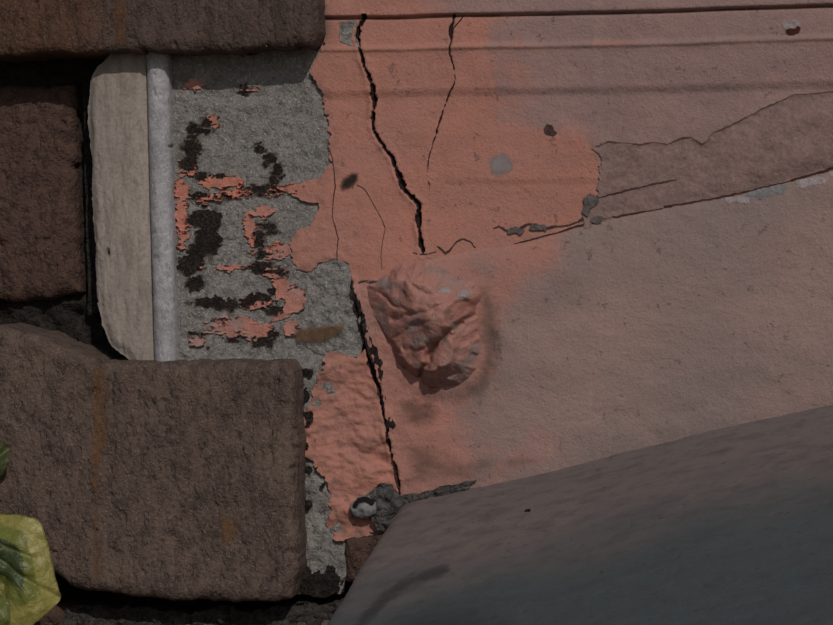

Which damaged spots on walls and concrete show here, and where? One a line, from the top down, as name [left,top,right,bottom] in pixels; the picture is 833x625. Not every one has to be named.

spalling [236,83,260,96]
spalling [174,115,364,357]
crack [327,145,339,261]
crack [356,14,464,255]
spalling [491,91,833,235]
spalling [303,387,313,428]
crack [350,185,400,493]
spalling [300,565,345,598]